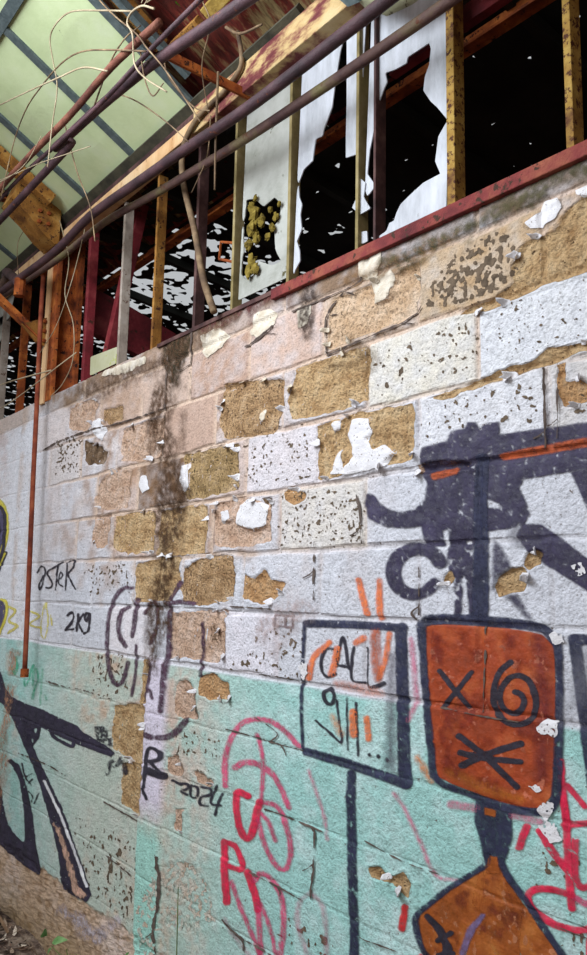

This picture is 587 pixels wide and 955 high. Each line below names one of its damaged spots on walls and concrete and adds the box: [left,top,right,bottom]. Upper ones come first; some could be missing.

water stain [146,336,189,669]
peeling [55,197,587,719]
peeling [92,651,149,818]
peeling [168,731,220,787]
peeling [536,719,560,737]